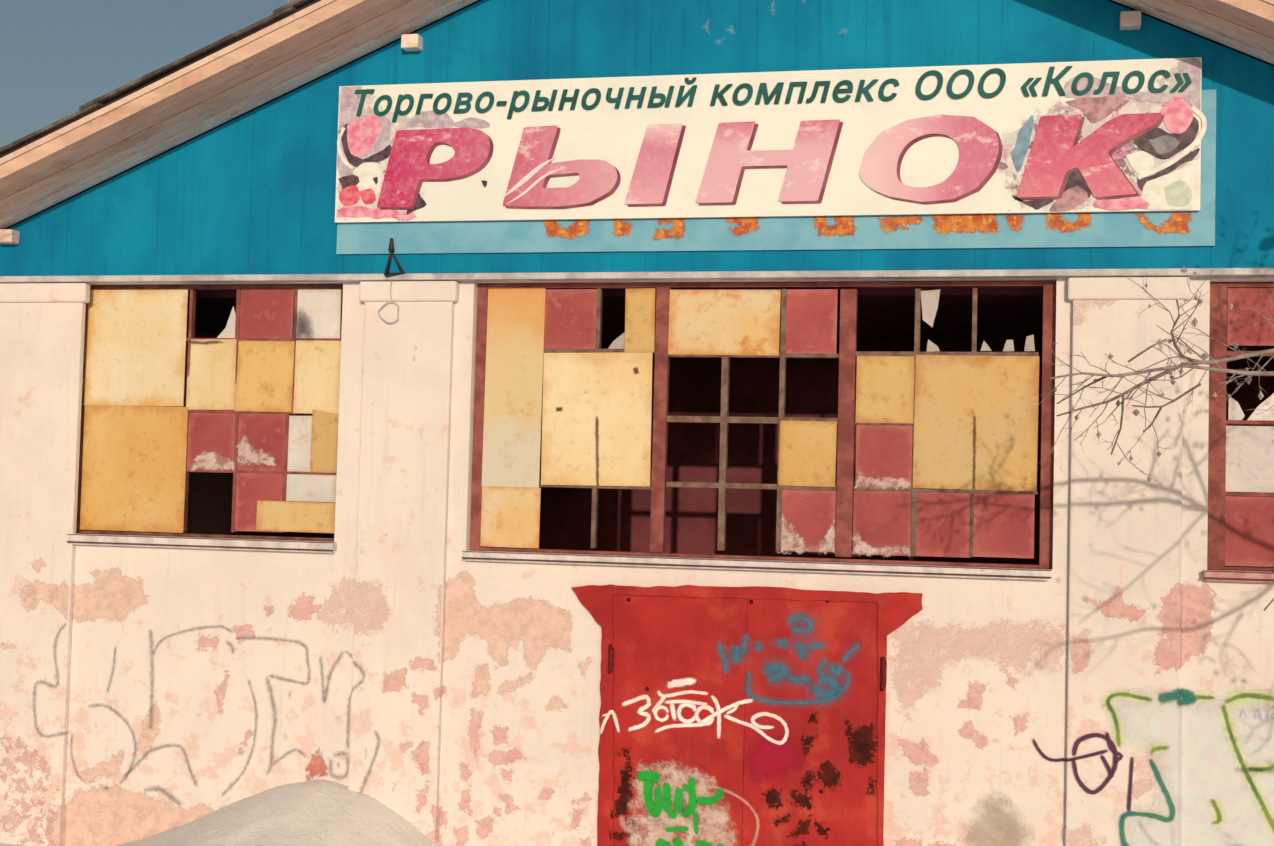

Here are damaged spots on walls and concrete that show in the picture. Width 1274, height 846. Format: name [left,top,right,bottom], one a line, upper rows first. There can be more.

peeling [20,559,148,623]
peeling [264,577,389,635]
peeling [383,571,593,846]
peeling [957,681,997,749]
peeling [888,619,1092,716]
peeling [1085,583,1217,673]
peeling [0,701,221,846]
peeling [306,749,328,781]
rust [609,747,640,846]
rust [762,712,878,846]
peeling [898,737,939,796]
water stain [968,803,1022,846]